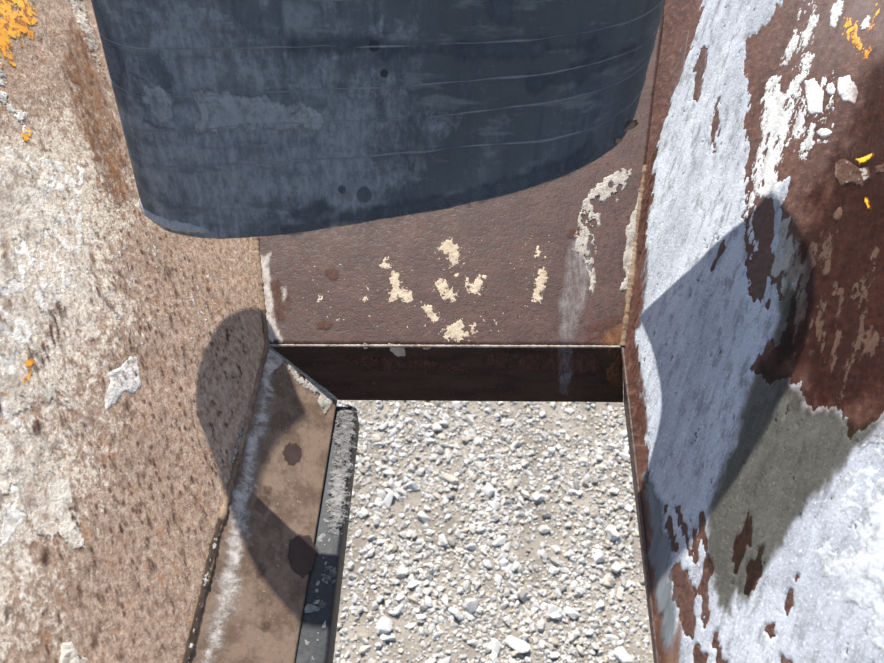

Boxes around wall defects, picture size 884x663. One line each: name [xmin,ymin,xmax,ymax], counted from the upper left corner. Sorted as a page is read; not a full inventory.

corrosion [842,4,880,59]
peeling [0,0,37,142]
spalling [693,49,707,100]
peeling [745,0,858,304]
corrosion [270,279,290,320]
peeling [379,257,478,343]
peeling [435,237,487,302]
peeling [531,267,549,304]
peeling [105,356,142,410]
leakage [283,443,301,465]
leakage [288,535,318,578]
spalling [664,504,726,663]